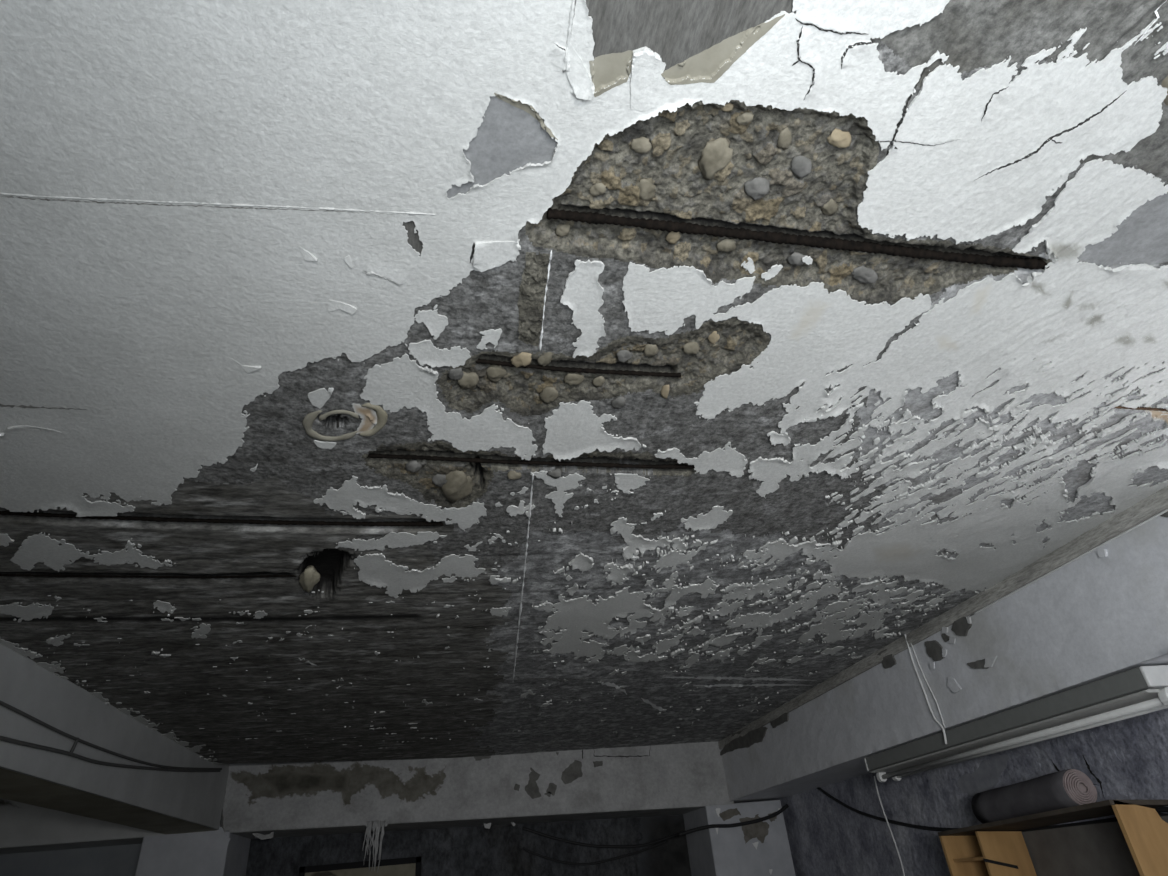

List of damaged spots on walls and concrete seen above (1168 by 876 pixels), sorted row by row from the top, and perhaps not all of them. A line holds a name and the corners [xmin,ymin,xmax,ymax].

crack [792,18,873,100]
peeling [447,93,558,198]
spalling [525,0,1168,315]
crack [850,69,959,156]
crack [974,86,1127,181]
peeling [0,221,1168,765]
peeling [514,760,583,799]